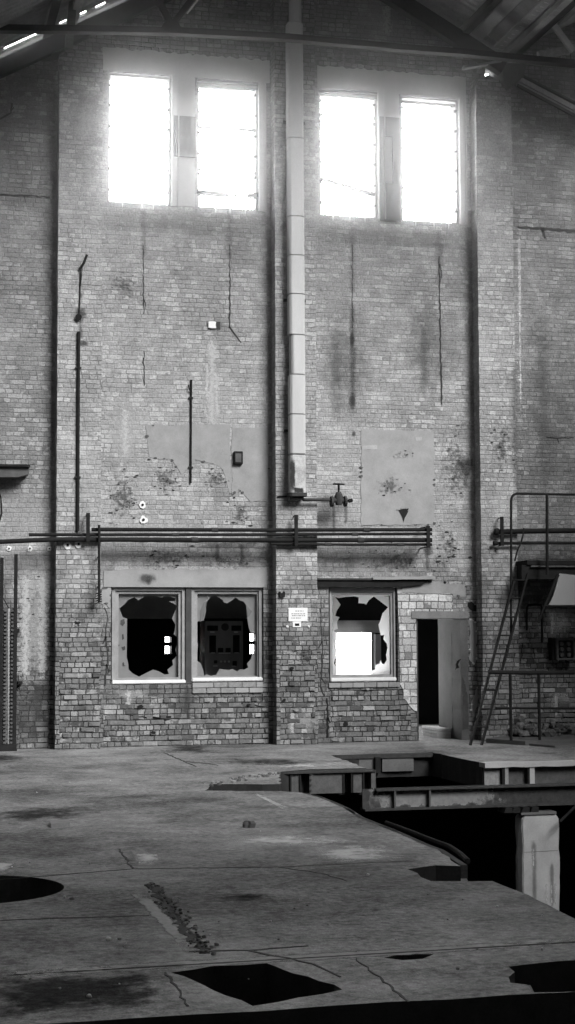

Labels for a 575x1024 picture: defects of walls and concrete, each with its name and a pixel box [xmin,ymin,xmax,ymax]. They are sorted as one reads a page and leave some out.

crack [140,246,148,314]
crack [228,244,242,343]
crack [349,245,357,328]
crack [436,256,444,405]